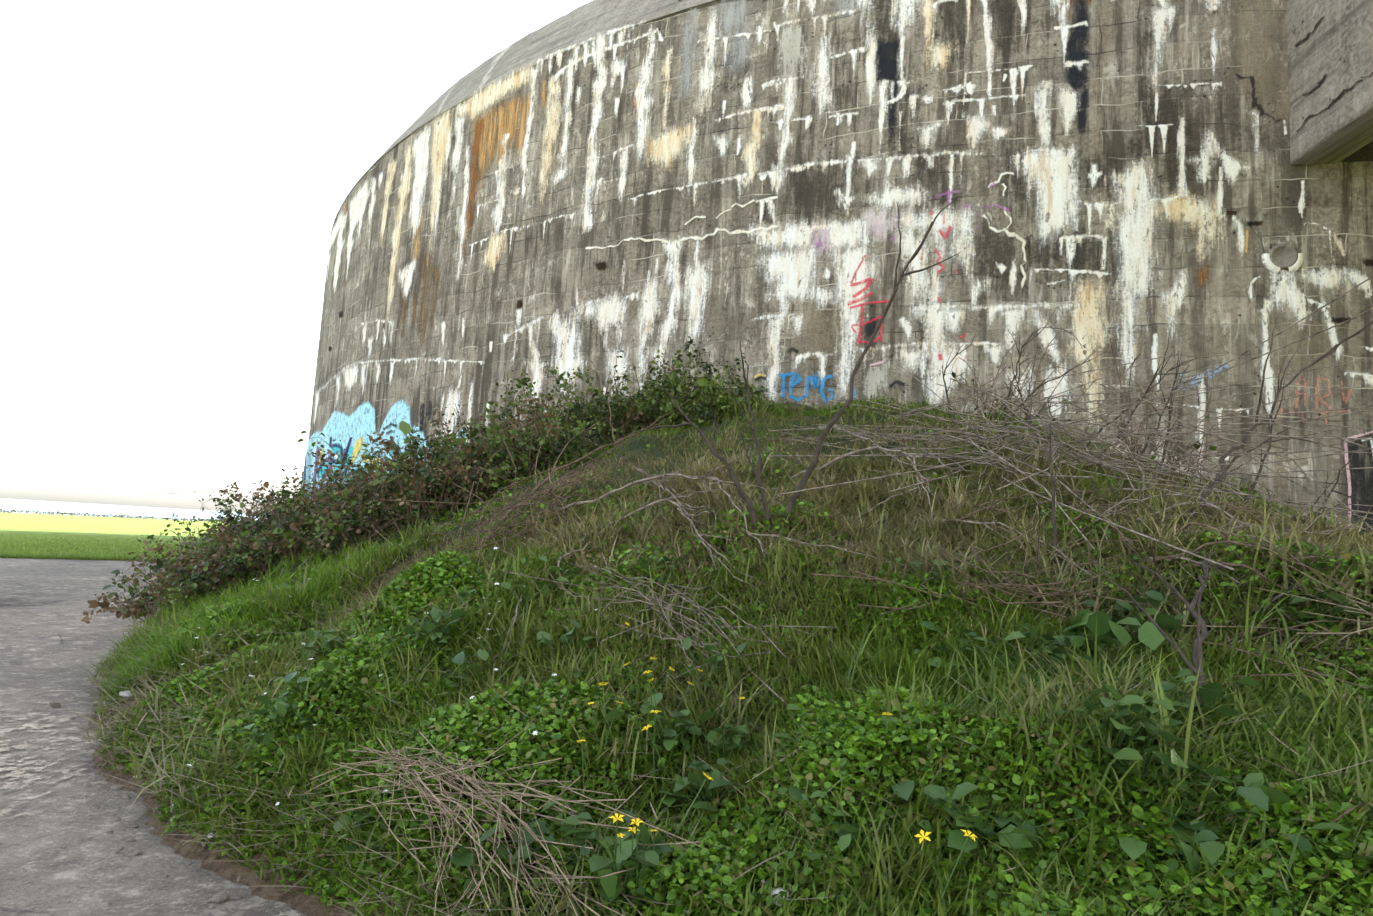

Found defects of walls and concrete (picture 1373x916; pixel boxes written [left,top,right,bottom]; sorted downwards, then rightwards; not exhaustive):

corrosion [462,91,534,251]
damp [308,0,1260,474]
crack [1236,72,1373,132]
crack [1295,16,1324,47]
damp [1248,180,1373,414]